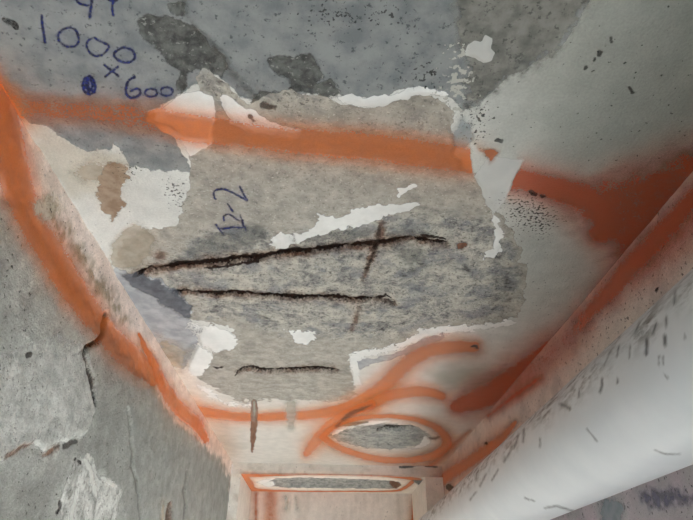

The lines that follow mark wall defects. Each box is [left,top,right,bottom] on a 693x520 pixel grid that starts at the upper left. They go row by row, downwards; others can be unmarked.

damp [78,162,130,222]
spalling [0,0,589,408]
crack [132,234,450,277]
corrosion [362,221,385,281]
crack [178,287,395,305]
crack [82,340,96,404]
crack [214,365,335,376]
corrosion [250,399,258,452]
spalling [328,420,439,450]